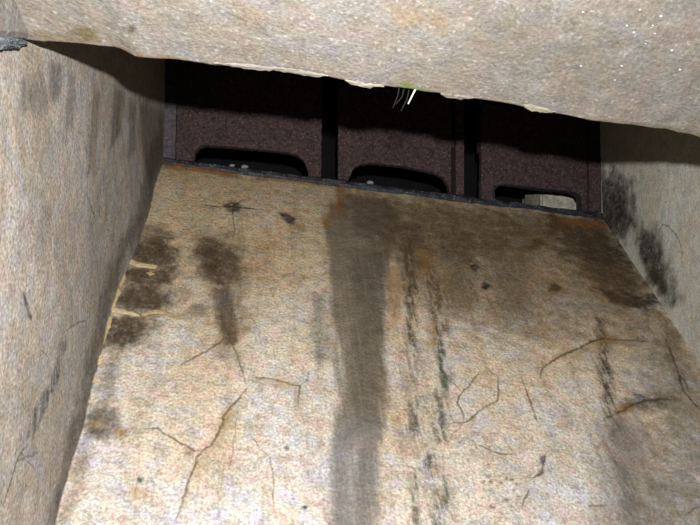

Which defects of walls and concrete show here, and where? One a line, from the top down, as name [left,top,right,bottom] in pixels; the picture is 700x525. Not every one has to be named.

water stain [107,317,142,346]
spalling [103,273,182,345]
spalling [130,259,157,276]
water stain [118,242,177,309]
water stain [196,240,238,342]
crack [217,202,254,211]
water stain [326,196,396,525]
water stain [550,172,666,310]